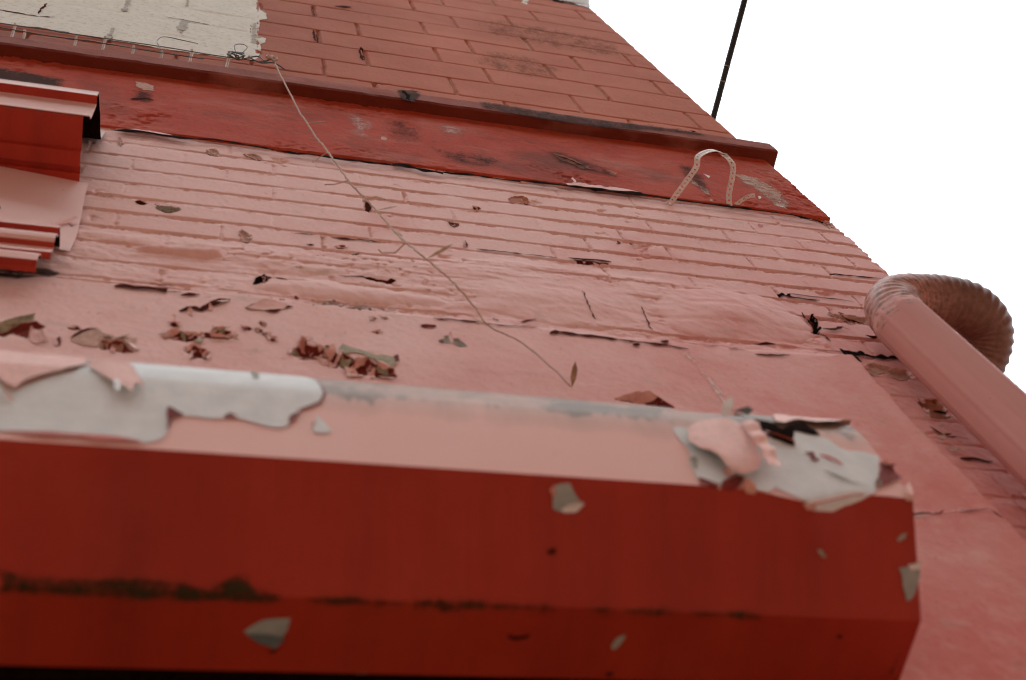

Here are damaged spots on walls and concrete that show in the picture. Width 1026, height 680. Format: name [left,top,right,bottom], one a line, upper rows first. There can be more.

spalling [253,274,287,285]
spalling [313,300,388,334]
peeling [0,292,332,443]
peeling [287,335,400,379]
spalling [917,398,993,463]
peeling [672,397,914,512]
peeling [550,483,584,513]
water stain [1,572,280,602]
peeling [899,560,923,601]
peeling [244,618,290,653]